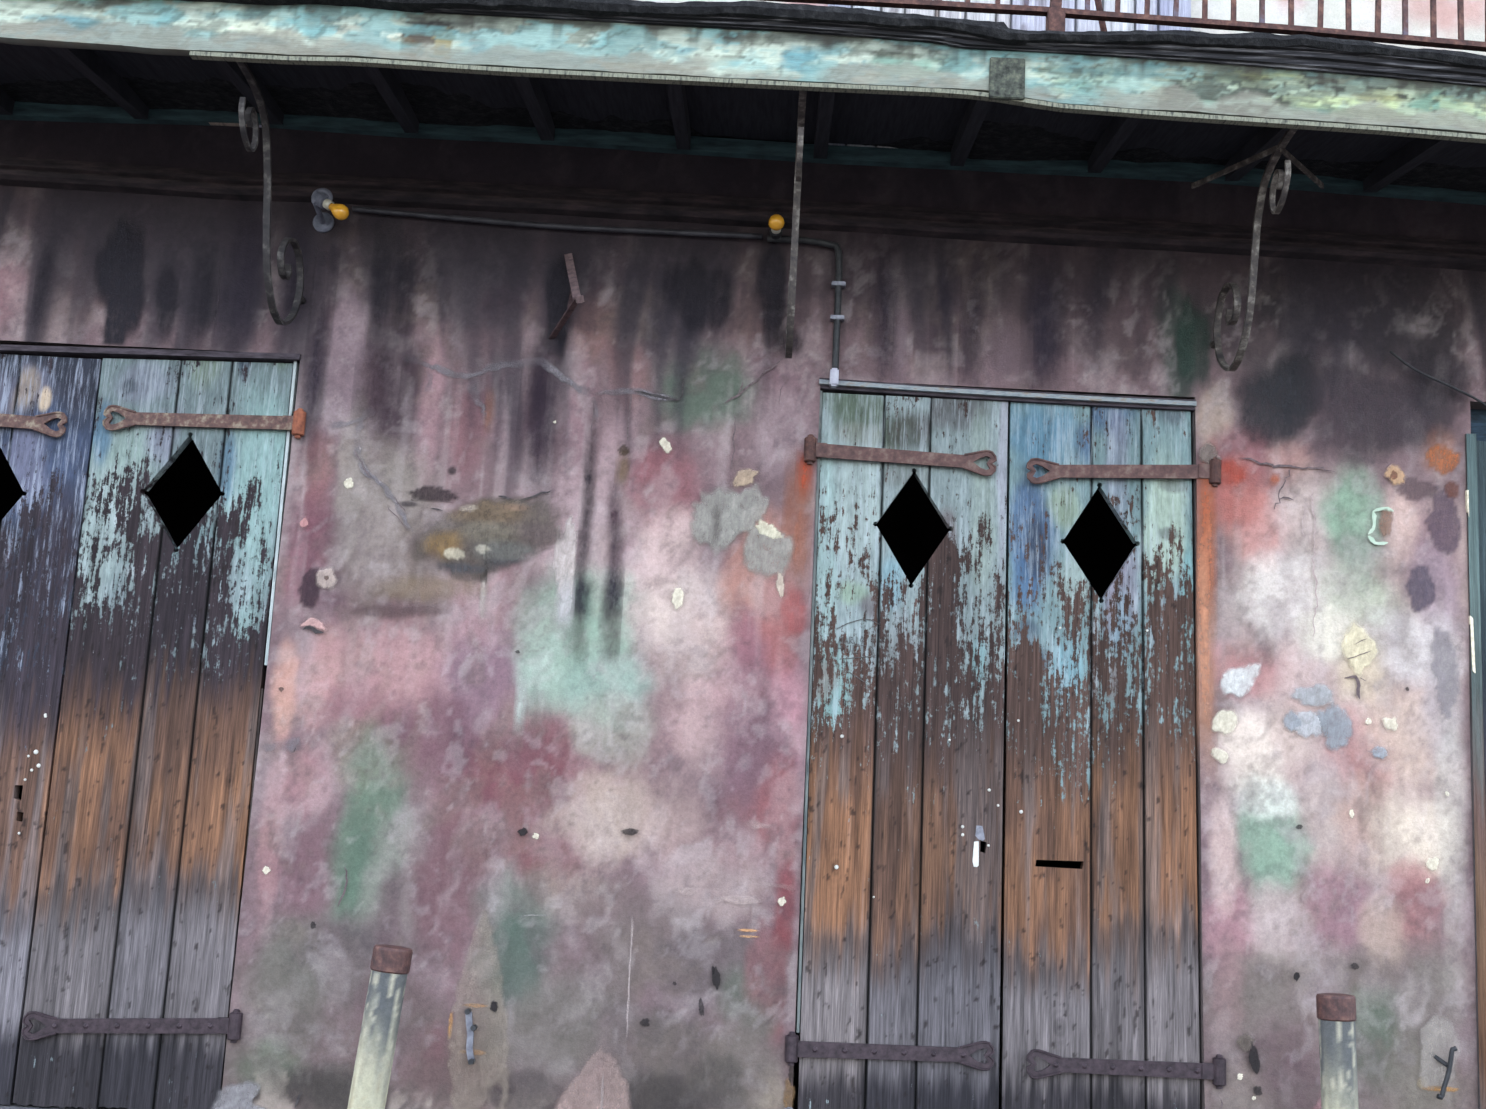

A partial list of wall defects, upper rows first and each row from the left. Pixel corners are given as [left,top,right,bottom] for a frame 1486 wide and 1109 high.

damp [97,221,176,344]
damp [548,261,570,349]
damp [759,246,799,351]
peeling [691,469,792,597]
crack [1243,458,1335,636]
spalling [1342,623,1377,675]
peeling [1212,664,1260,763]
peeling [1284,684,1398,749]